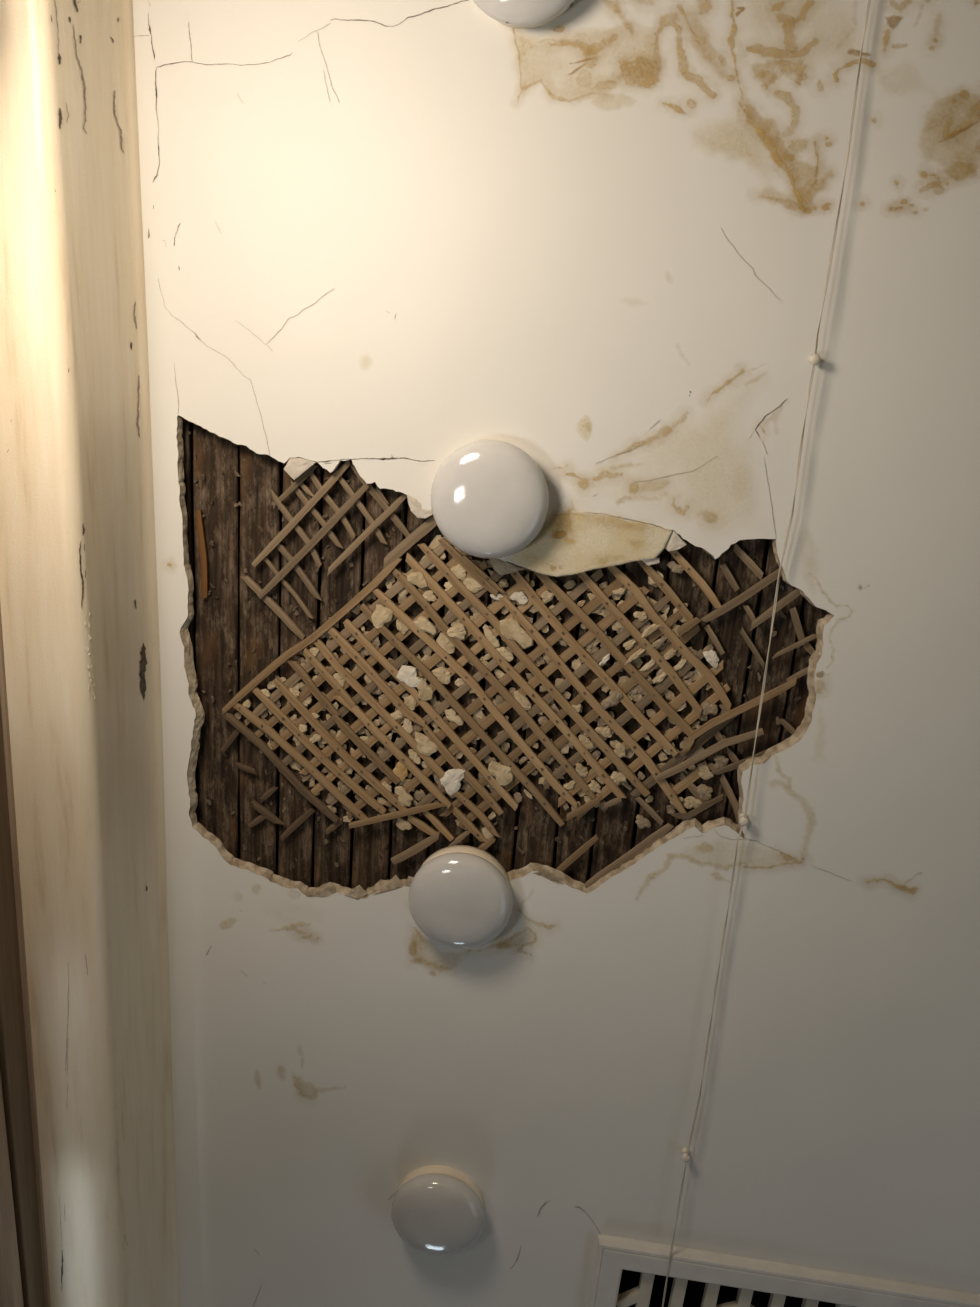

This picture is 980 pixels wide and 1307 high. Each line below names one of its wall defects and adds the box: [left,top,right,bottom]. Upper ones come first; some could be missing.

damp [633,8,716,98]
damp [728,0,817,121]
damp [833,17,900,82]
damp [740,105,831,213]
crack [51,0,467,454]
damp [514,513,649,572]
flaking render [176,415,834,900]